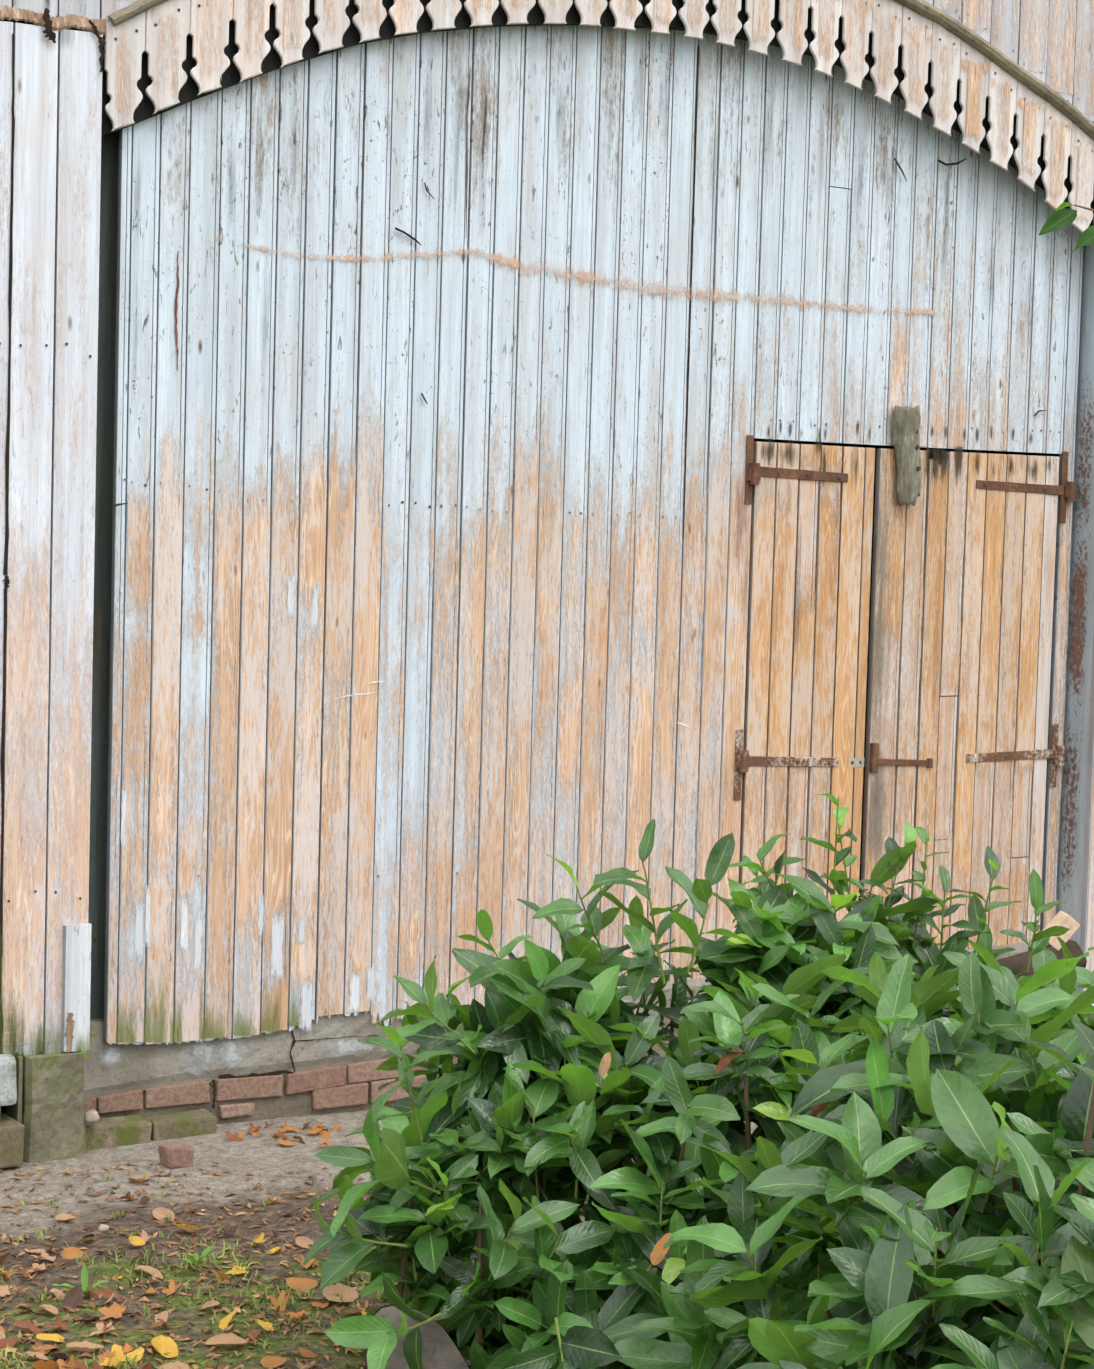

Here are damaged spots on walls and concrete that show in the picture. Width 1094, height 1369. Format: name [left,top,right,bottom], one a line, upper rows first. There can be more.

peeling [247,0,300,229]
peeling [451,0,511,185]
peeling [603,0,636,116]
peeling [653,0,686,95]
peeling [699,0,770,195]
peeling [787,0,1094,222]
peeling [105,146,1075,1071]
corrosion [1068,379,1094,715]
peeling [0,536,93,1051]
corrosion [1061,733,1079,897]